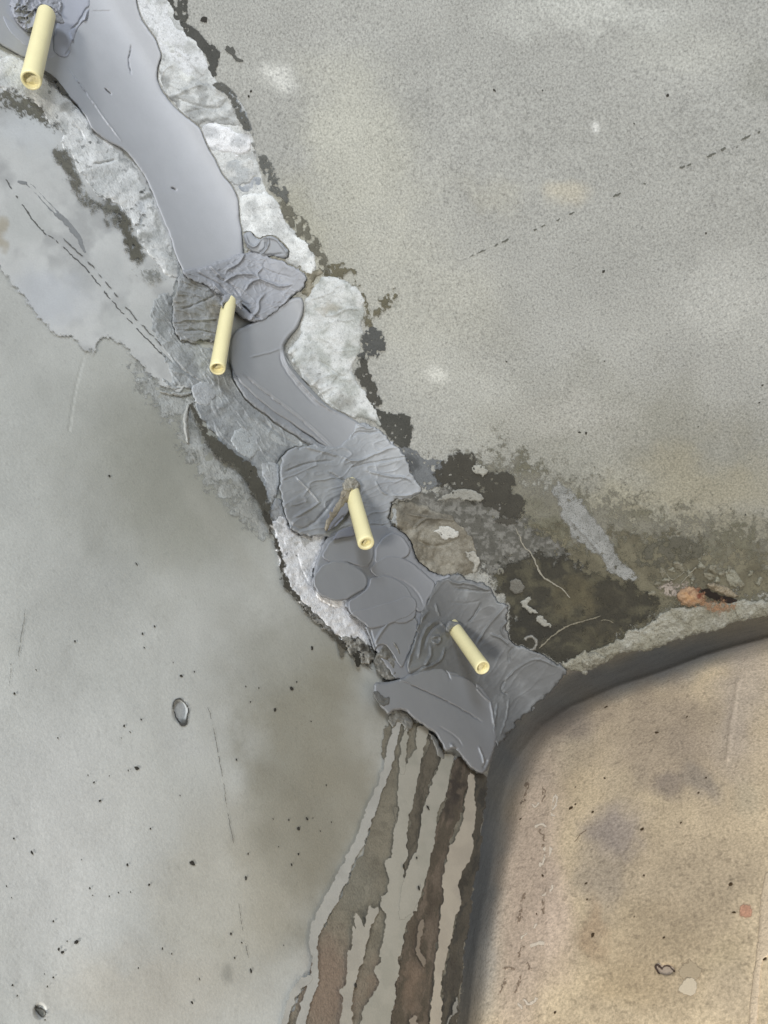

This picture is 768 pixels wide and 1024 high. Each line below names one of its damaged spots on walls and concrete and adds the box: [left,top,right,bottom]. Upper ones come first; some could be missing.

water stain [0,50,185,392]
peeling [137,0,381,427]
peeling [231,424,287,521]
peeling [434,526,459,540]
peeling [437,489,484,502]
peeling [465,551,480,573]
water stain [390,429,768,663]
corrosion [660,581,735,614]
water stain [282,721,488,1024]